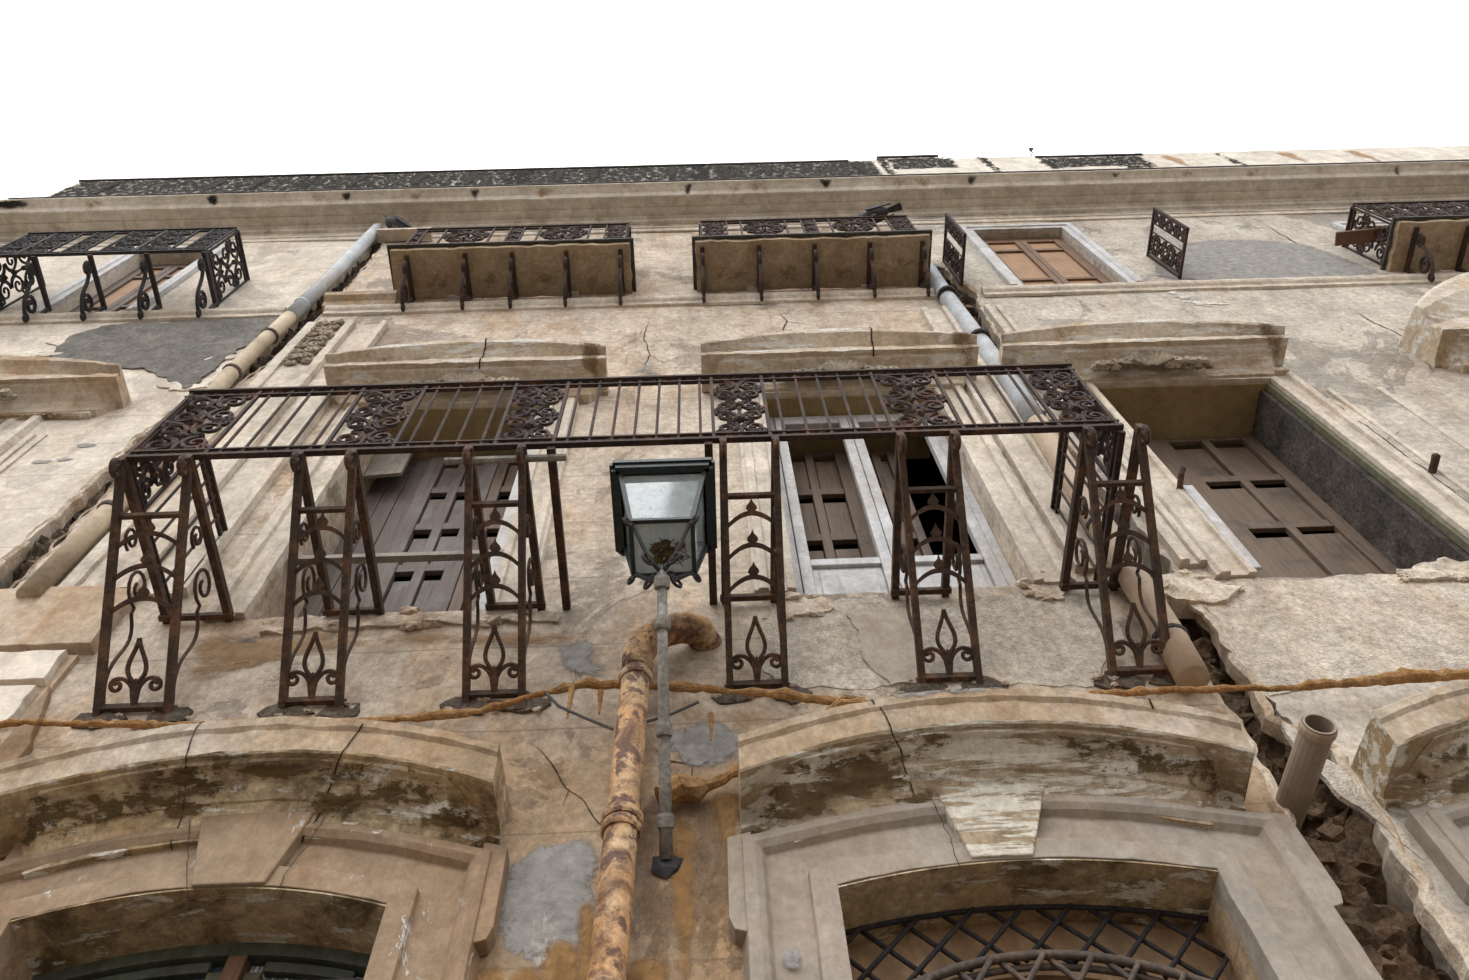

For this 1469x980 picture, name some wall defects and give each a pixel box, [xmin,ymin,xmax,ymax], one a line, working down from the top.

crack [170,721,204,926]
leakage [19,755,480,846]
crack [254,724,374,918]
rust [627,793,739,980]
crack [870,699,972,892]
leakage [1058,735,1232,801]
crack [1178,604,1469,980]